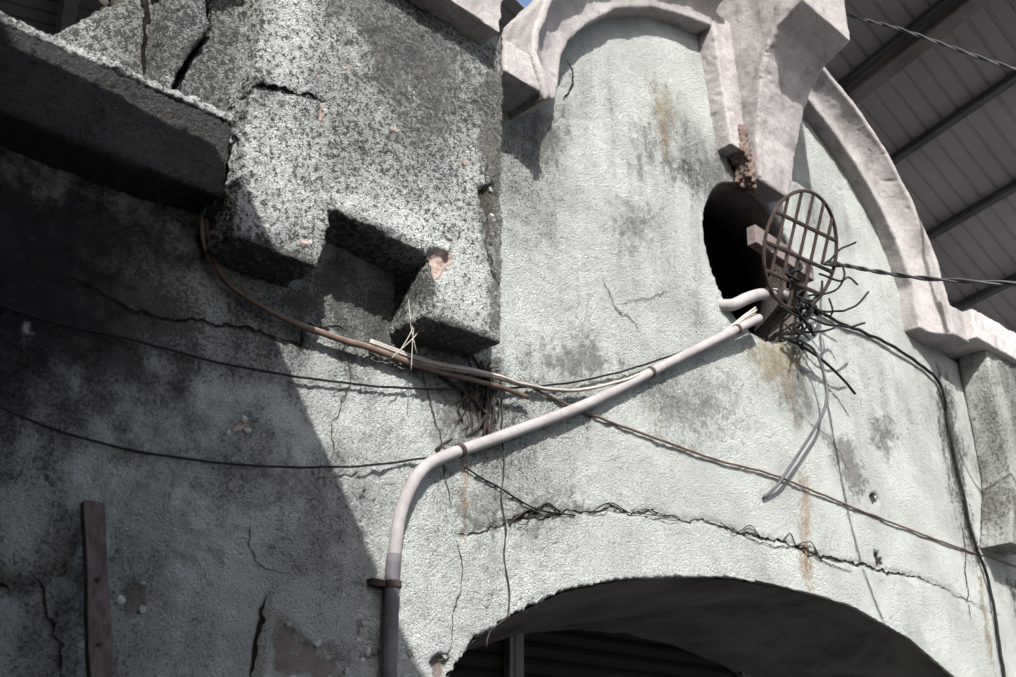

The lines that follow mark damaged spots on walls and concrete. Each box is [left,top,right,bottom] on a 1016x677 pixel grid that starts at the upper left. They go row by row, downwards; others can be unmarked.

crack [172,0,212,92]
crack [230,83,331,106]
spalling [427,245,452,281]
crack [25,272,352,463]
water stain [786,354,811,425]
crack [422,371,452,507]
water stain [823,437,869,494]
water stain [870,415,899,459]
crack [440,504,999,662]
crack [30,573,64,677]
spalling [272,621,350,677]
spalling [429,654,447,677]